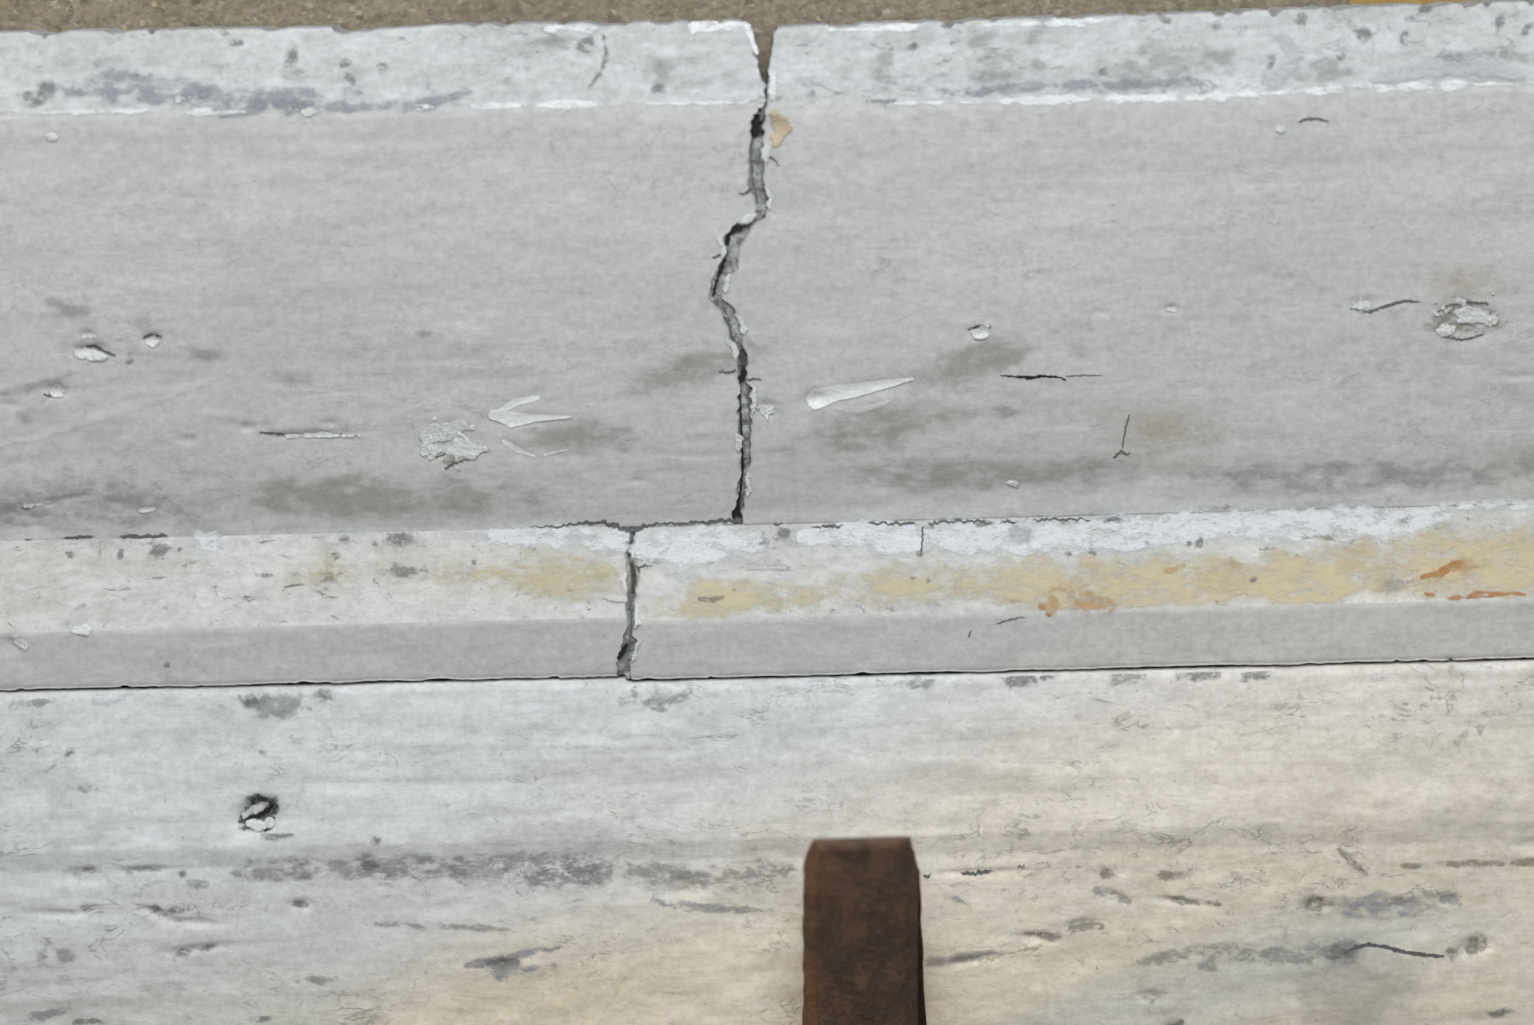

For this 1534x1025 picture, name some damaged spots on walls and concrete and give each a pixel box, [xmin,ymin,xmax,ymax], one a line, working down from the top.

spalling [1350,293,1507,341]
crack [531,72,1119,679]
spalling [418,416,490,470]
peeling [241,802,275,832]